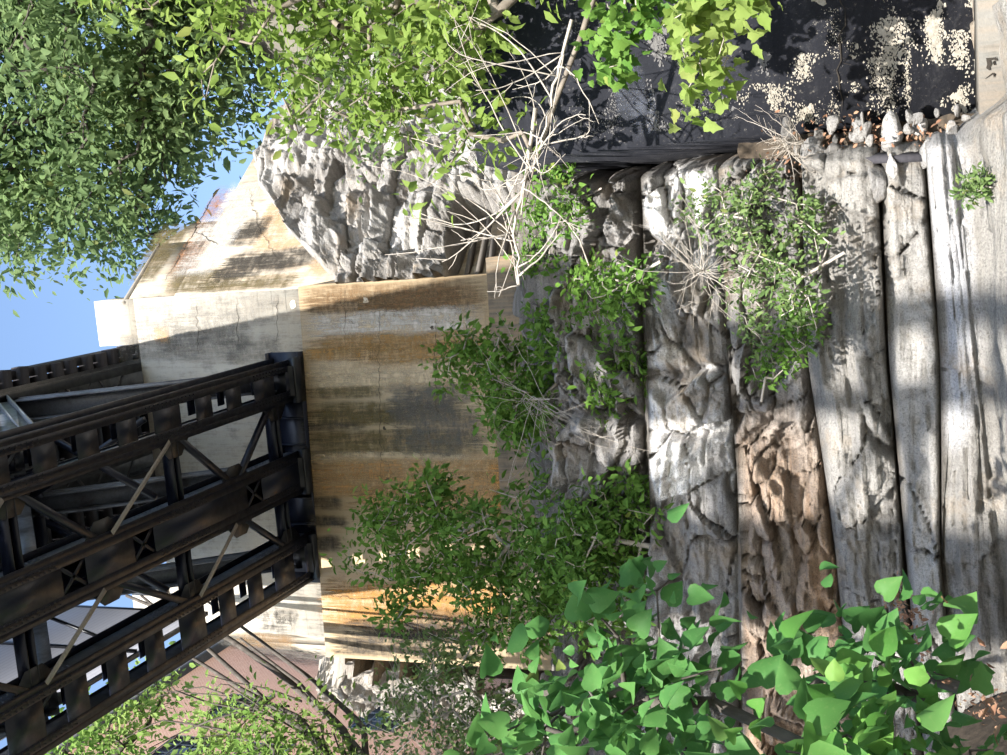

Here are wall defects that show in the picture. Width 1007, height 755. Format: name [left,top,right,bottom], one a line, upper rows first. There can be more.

peeling [645,0,975,132]
water stain [133,186,311,292]
water stain [306,280,476,336]
water stain [307,358,478,463]
water stain [308,498,345,550]